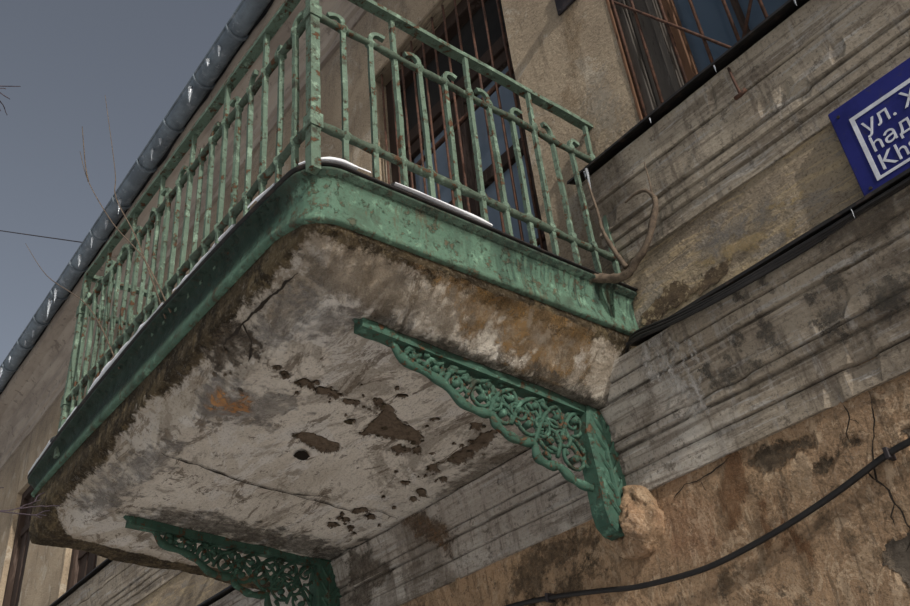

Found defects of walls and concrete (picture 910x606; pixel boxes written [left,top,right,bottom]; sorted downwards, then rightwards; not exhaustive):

crack [223,273,298,362]
spalling [199,313,498,502]
crack [161,452,395,519]
peeling [327,507,381,534]
crack [844,392,910,551]
flaking render [882,532,910,587]